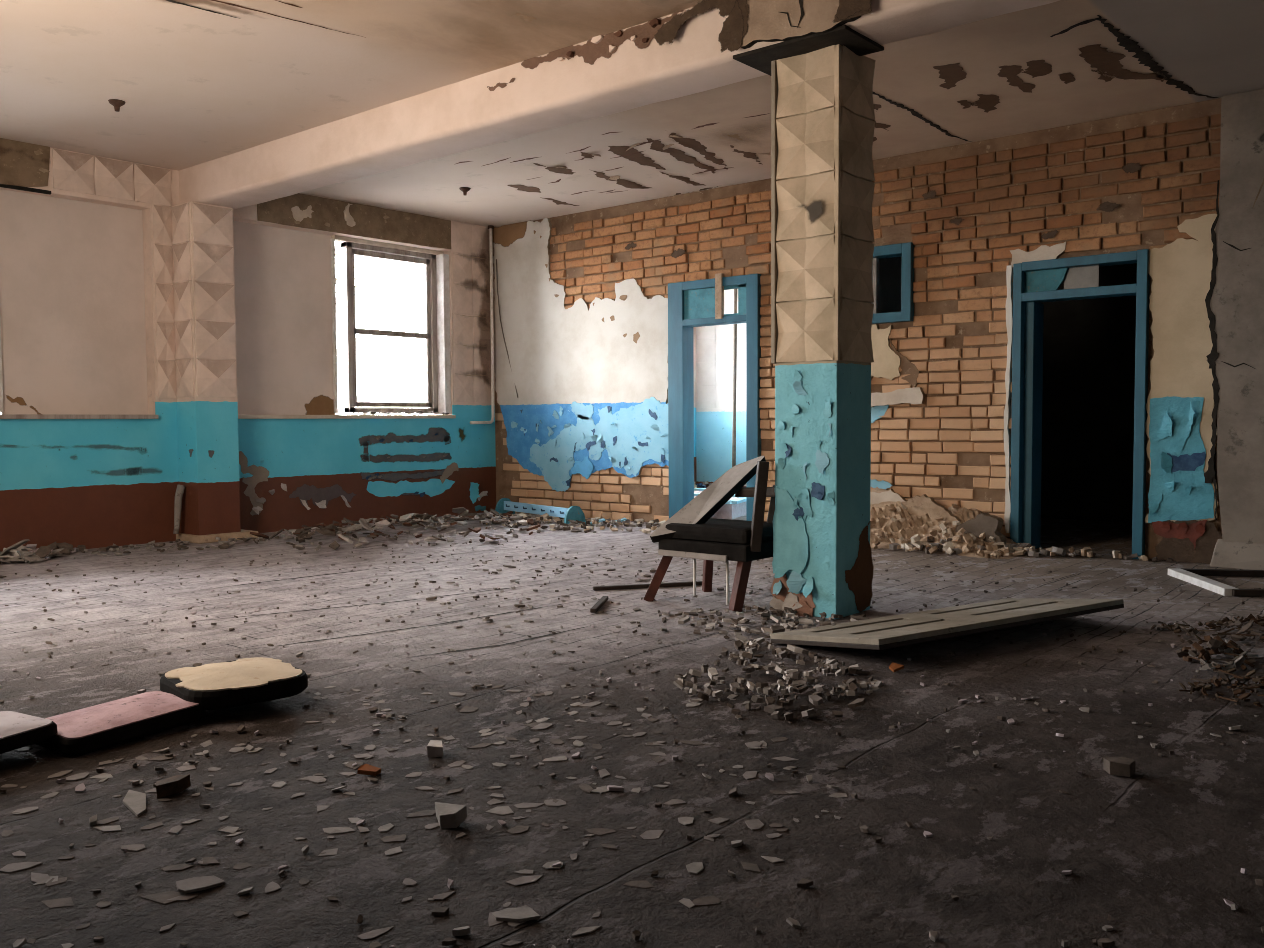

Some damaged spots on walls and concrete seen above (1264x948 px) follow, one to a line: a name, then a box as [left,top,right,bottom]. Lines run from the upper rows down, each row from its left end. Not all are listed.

spalling [487,0,749,91]
spalling [833,0,872,23]
peeling [933,63,1000,113]
peeling [998,60,1076,93]
peeling [1079,44,1164,82]
spalling [257,193,451,249]
spalling [454,123,835,617]
spalling [870,113,1221,537]
crack [1204,180,1255,520]
peeling [239,451,459,516]
peeling [1148,396,1222,564]
spalling [845,521,874,612]